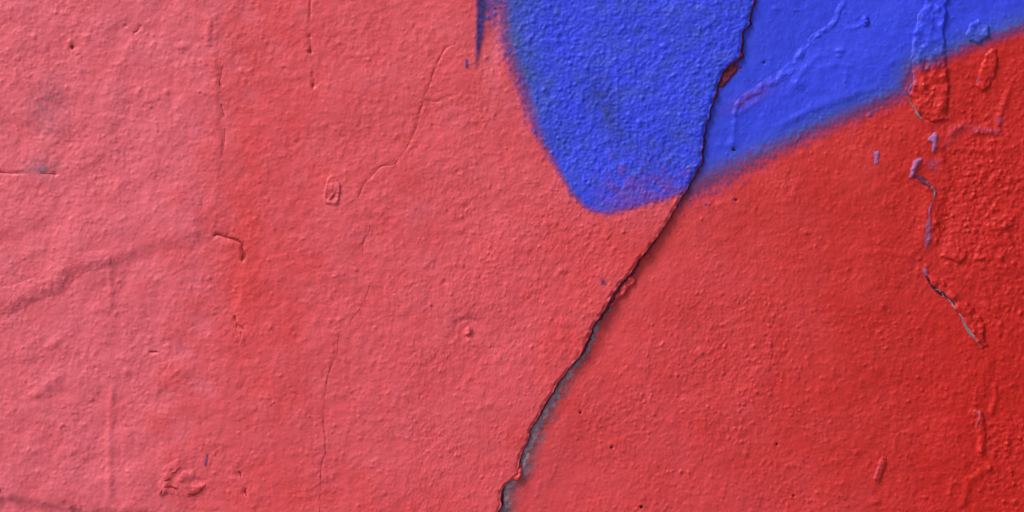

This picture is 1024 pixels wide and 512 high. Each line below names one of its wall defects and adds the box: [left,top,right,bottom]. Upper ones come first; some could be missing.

crack [498,0,756,512]